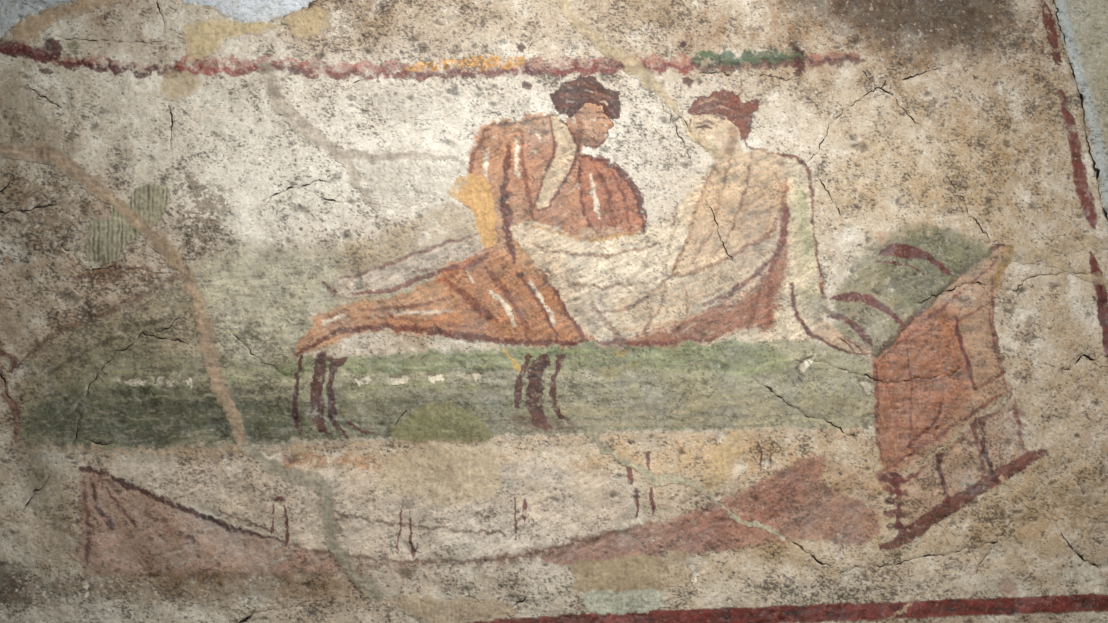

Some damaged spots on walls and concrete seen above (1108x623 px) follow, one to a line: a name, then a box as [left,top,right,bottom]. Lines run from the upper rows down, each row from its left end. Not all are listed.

water stain [767,0,1036,76]
crack [811,65,940,215]
crack [919,0,1108,303]
crack [0,139,385,606]
crack [759,383,860,436]